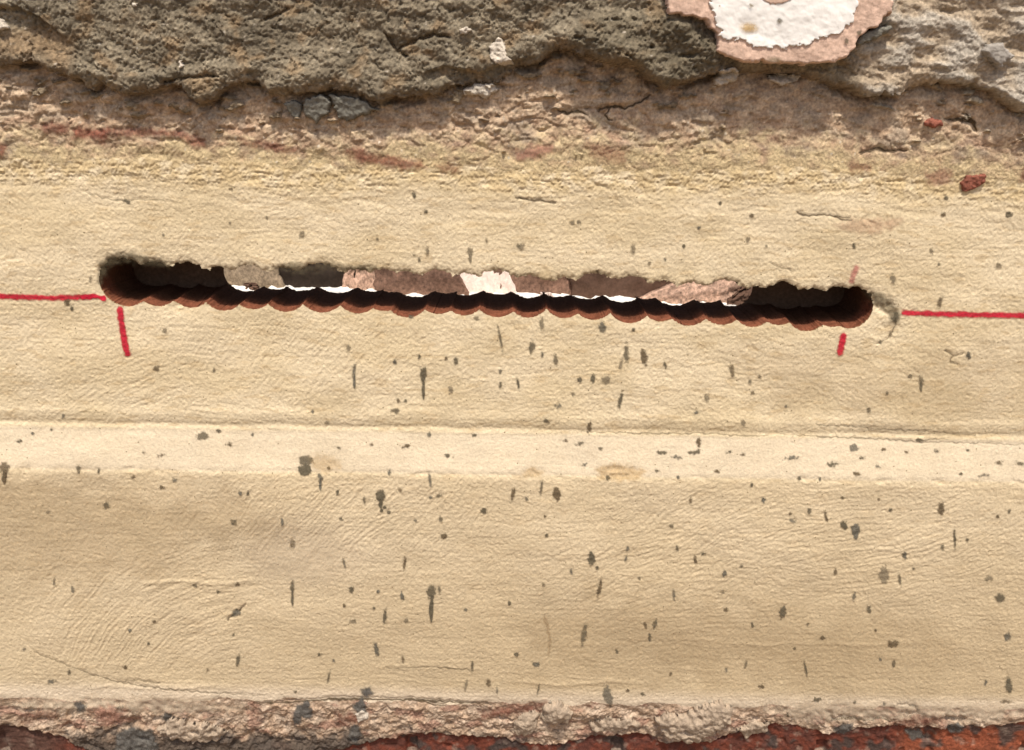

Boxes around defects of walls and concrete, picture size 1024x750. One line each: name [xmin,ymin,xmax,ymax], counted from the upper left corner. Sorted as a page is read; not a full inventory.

spalling [0,0,1024,184]
spalling [0,697,703,750]
spalling [701,704,1024,743]